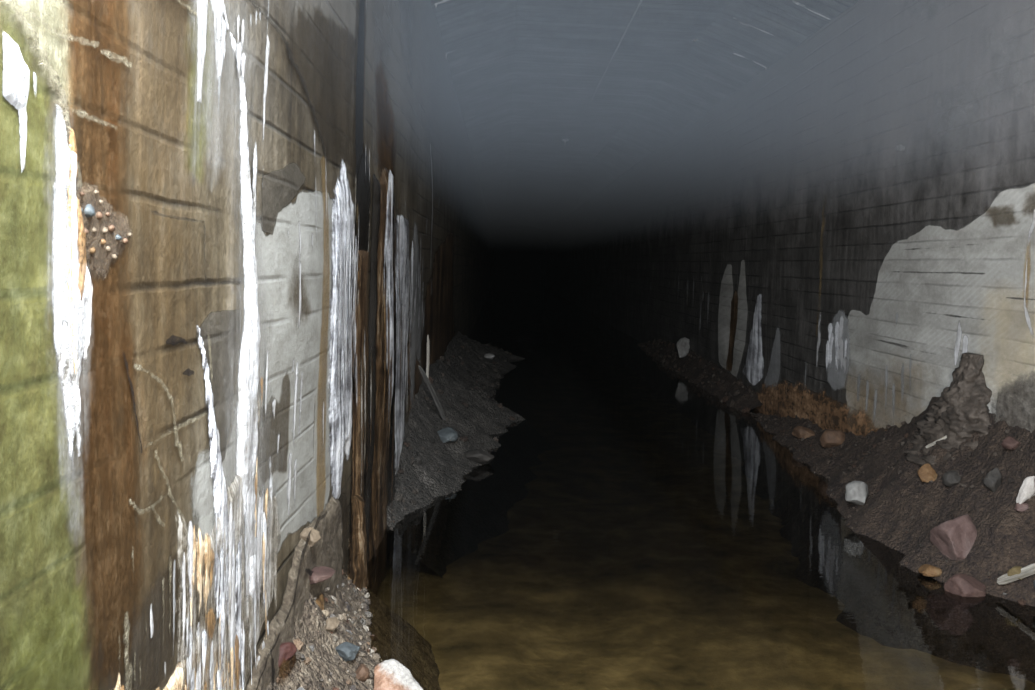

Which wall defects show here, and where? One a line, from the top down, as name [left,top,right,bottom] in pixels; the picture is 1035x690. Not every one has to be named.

leakage [3,0,93,459]
rust [76,0,124,218]
rust [84,250,137,668]
crack [123,353,205,526]
peeling [166,309,242,539]
efflorescence [146,0,297,690]
peeling [246,163,344,690]
efflorescence [288,224,317,324]
leakage [328,147,371,575]
efflorescence [395,143,439,474]
peeling [846,183,1035,433]
efflorescence [114,614,141,690]